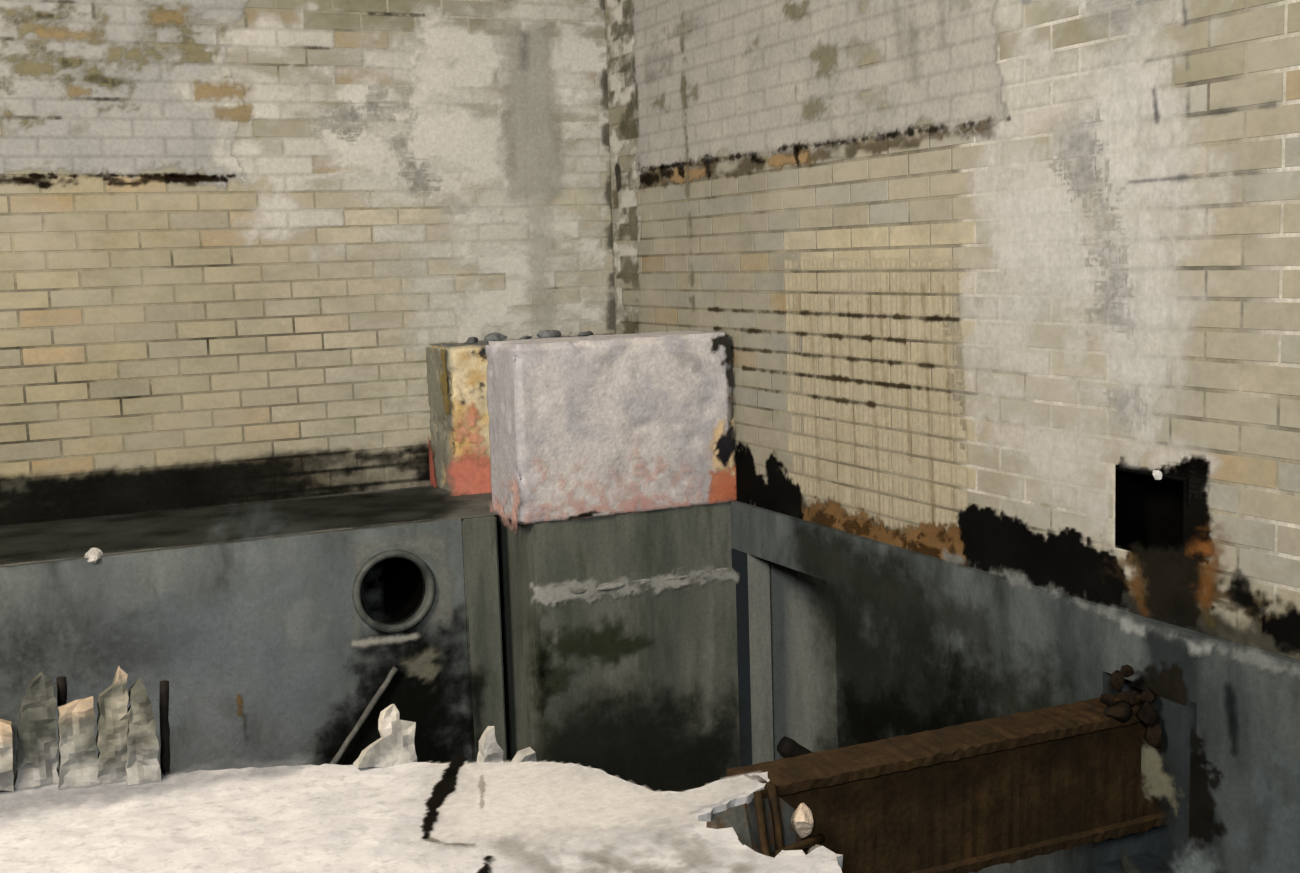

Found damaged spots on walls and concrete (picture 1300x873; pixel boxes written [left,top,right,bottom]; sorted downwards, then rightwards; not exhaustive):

peeling [0,0,251,188]
water stain [175,0,616,351]
water stain [963,0,1215,473]
water stain [0,444,483,811]
spalling [569,493,684,519]
water stain [527,606,740,792]
spalling [708,334,1300,873]
corrosion [1190,542,1218,607]
crack [420,757,493,873]